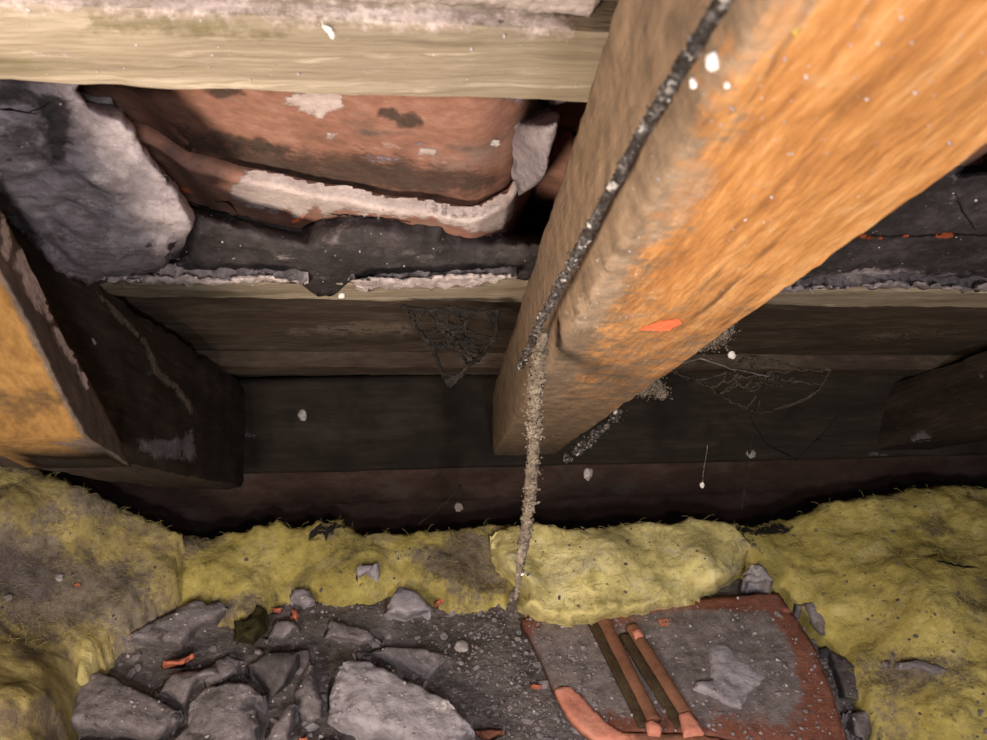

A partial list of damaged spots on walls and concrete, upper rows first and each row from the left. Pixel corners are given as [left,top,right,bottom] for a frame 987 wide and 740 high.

crack [866,192,987,238]